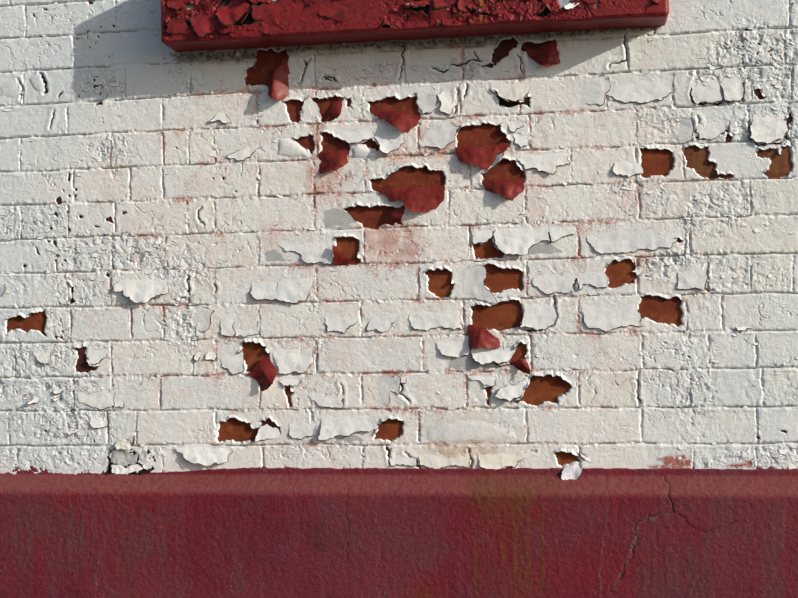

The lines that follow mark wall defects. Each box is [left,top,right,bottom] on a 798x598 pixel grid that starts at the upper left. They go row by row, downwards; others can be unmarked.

peeling [153,0,345,38]
peeling [78,56,124,106]
peeling [480,35,560,78]
peeling [574,28,798,206]
peeling [0,171,538,475]
peeling [366,192,770,413]
peeling [555,440,592,480]
peeling [752,436,798,469]
crack [599,478,743,590]